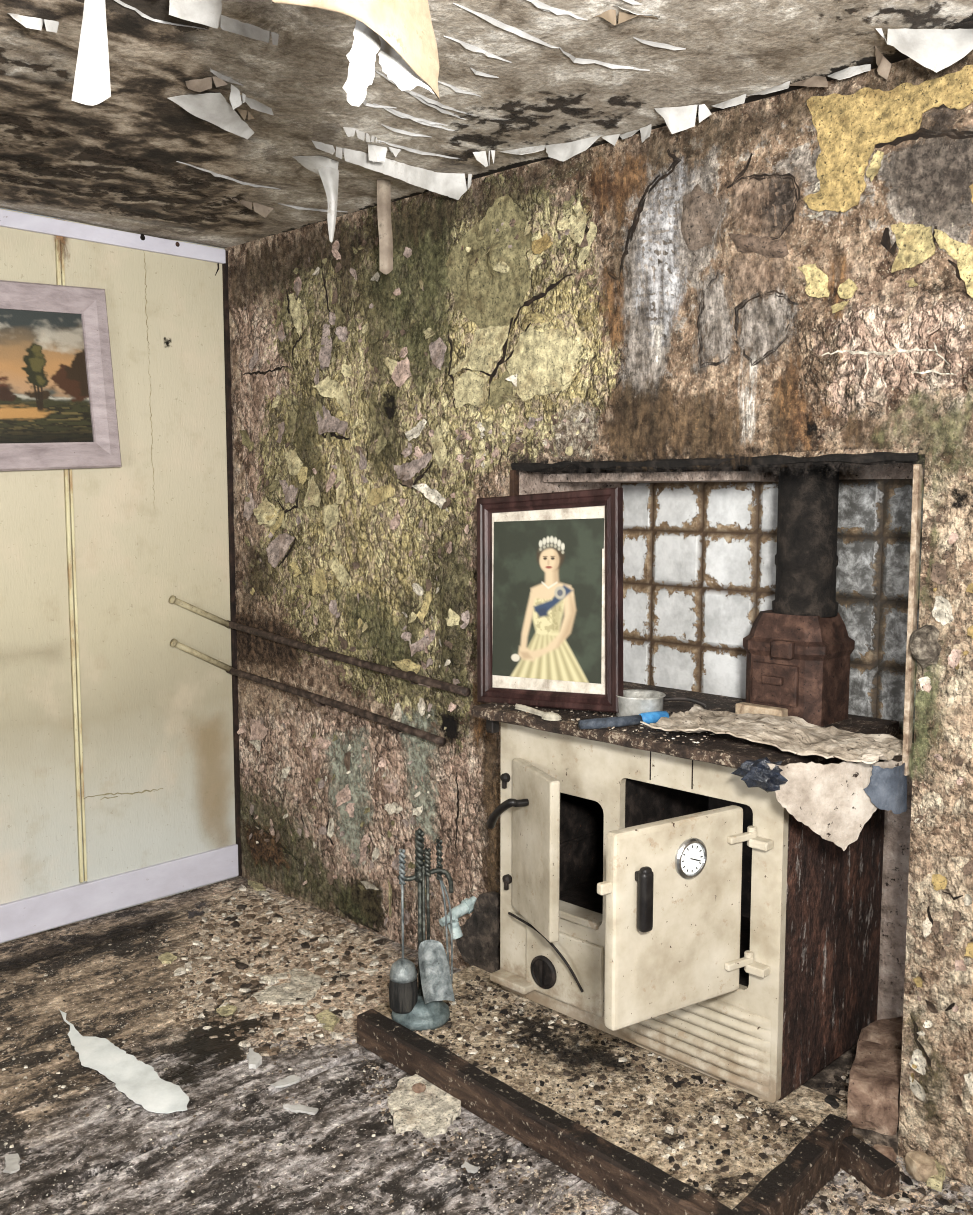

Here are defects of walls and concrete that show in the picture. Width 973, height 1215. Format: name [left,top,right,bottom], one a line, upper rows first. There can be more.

mould [0,47,74,85]
mould [0,114,255,231]
crack [448,149,681,408]
peeling [617,65,973,398]
damp [652,325,662,362]